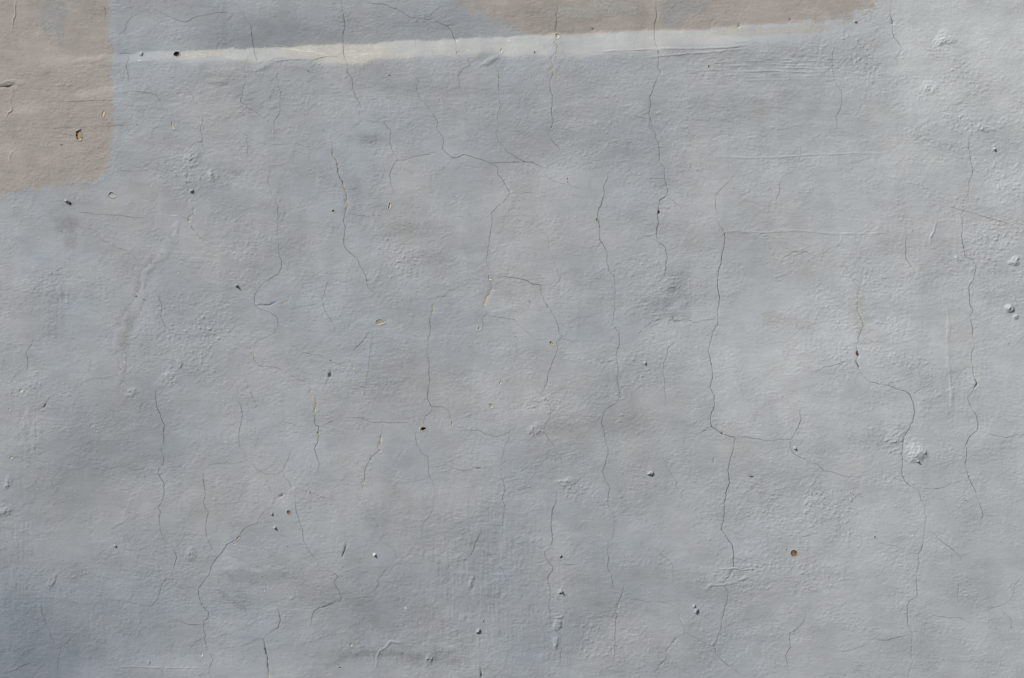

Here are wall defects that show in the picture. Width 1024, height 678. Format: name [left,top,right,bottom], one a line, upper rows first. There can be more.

crack [96,143,570,675]
crack [98,4,577,457]
crack [590,183,847,671]
crack [819,144,1017,670]